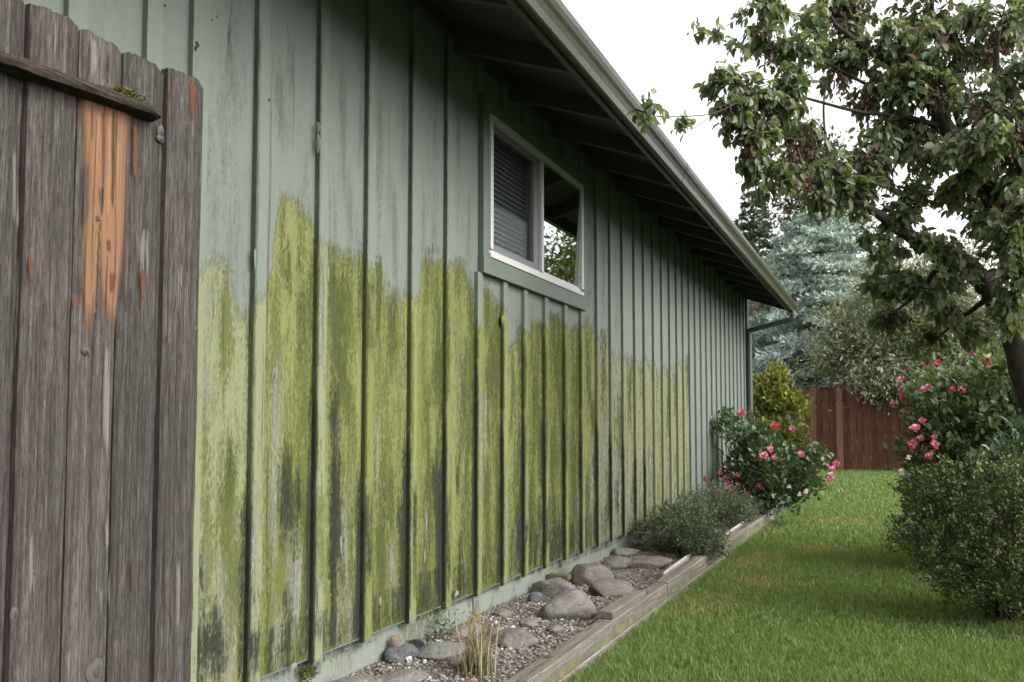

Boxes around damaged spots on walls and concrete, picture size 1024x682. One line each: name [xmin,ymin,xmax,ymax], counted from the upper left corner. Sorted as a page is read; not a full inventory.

leakage [196,361,647,682]